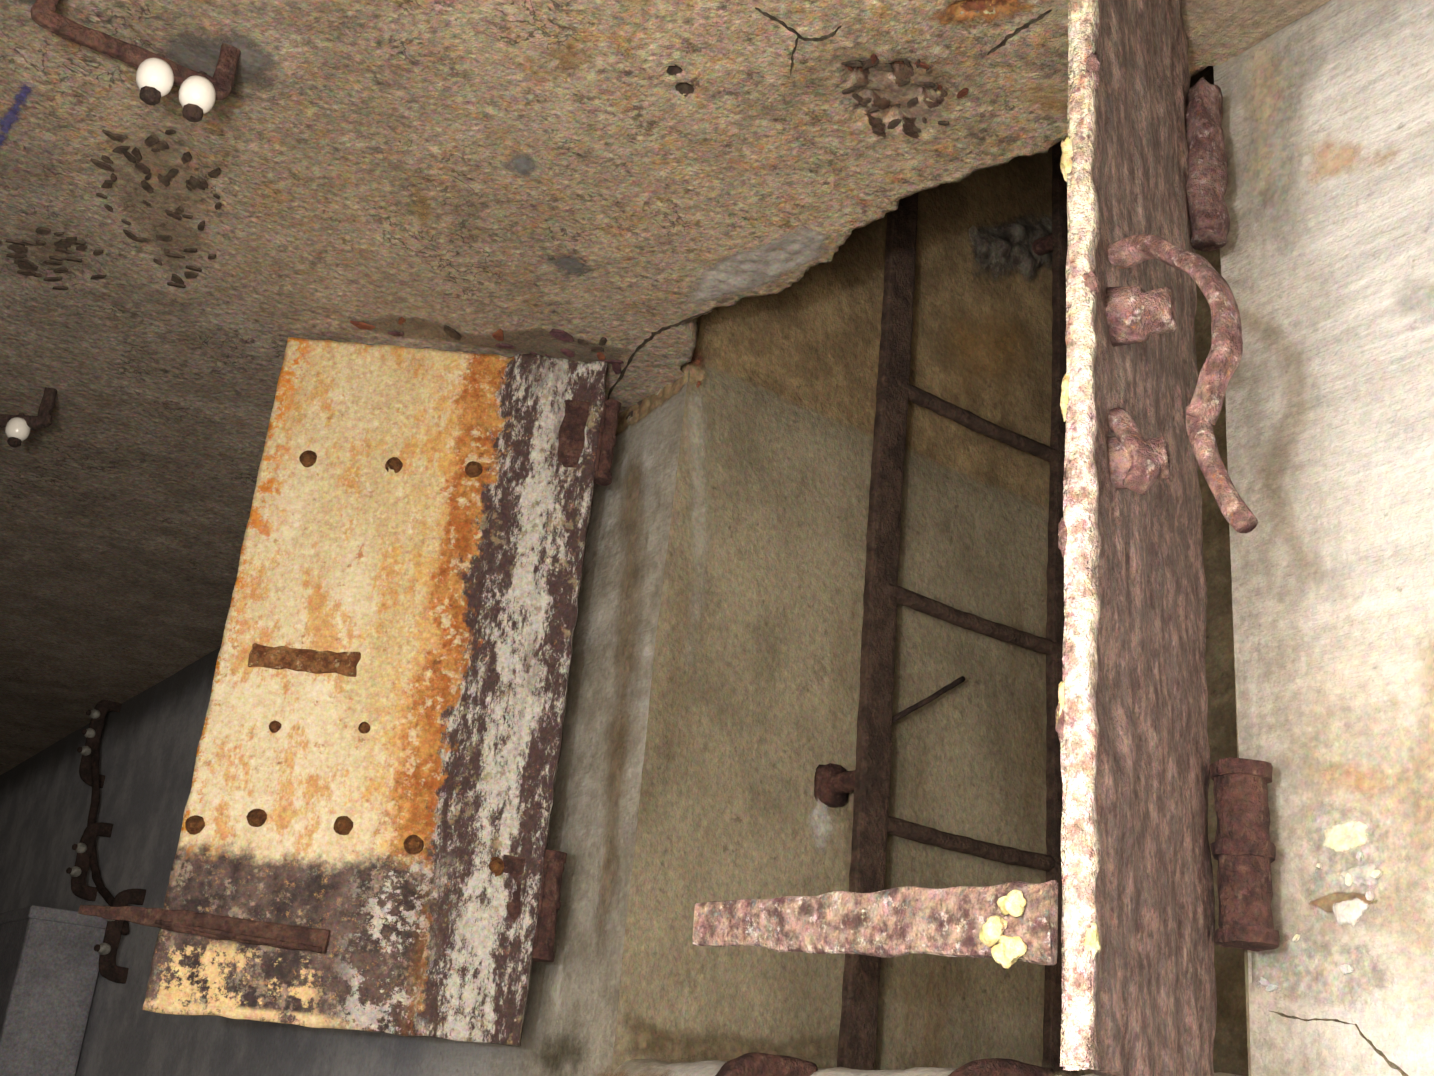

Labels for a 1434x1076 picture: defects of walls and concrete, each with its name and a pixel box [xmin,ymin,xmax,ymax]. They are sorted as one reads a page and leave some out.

rust [932,0,1033,24]
spalling [841,54,968,138]
peeling [91,129,222,288]
peeling [0,227,103,290]
crack [608,310,712,399]
peeling [1308,803,1383,925]
peeling [1251,934,1387,1005]
crack [1270,1011,1409,1076]